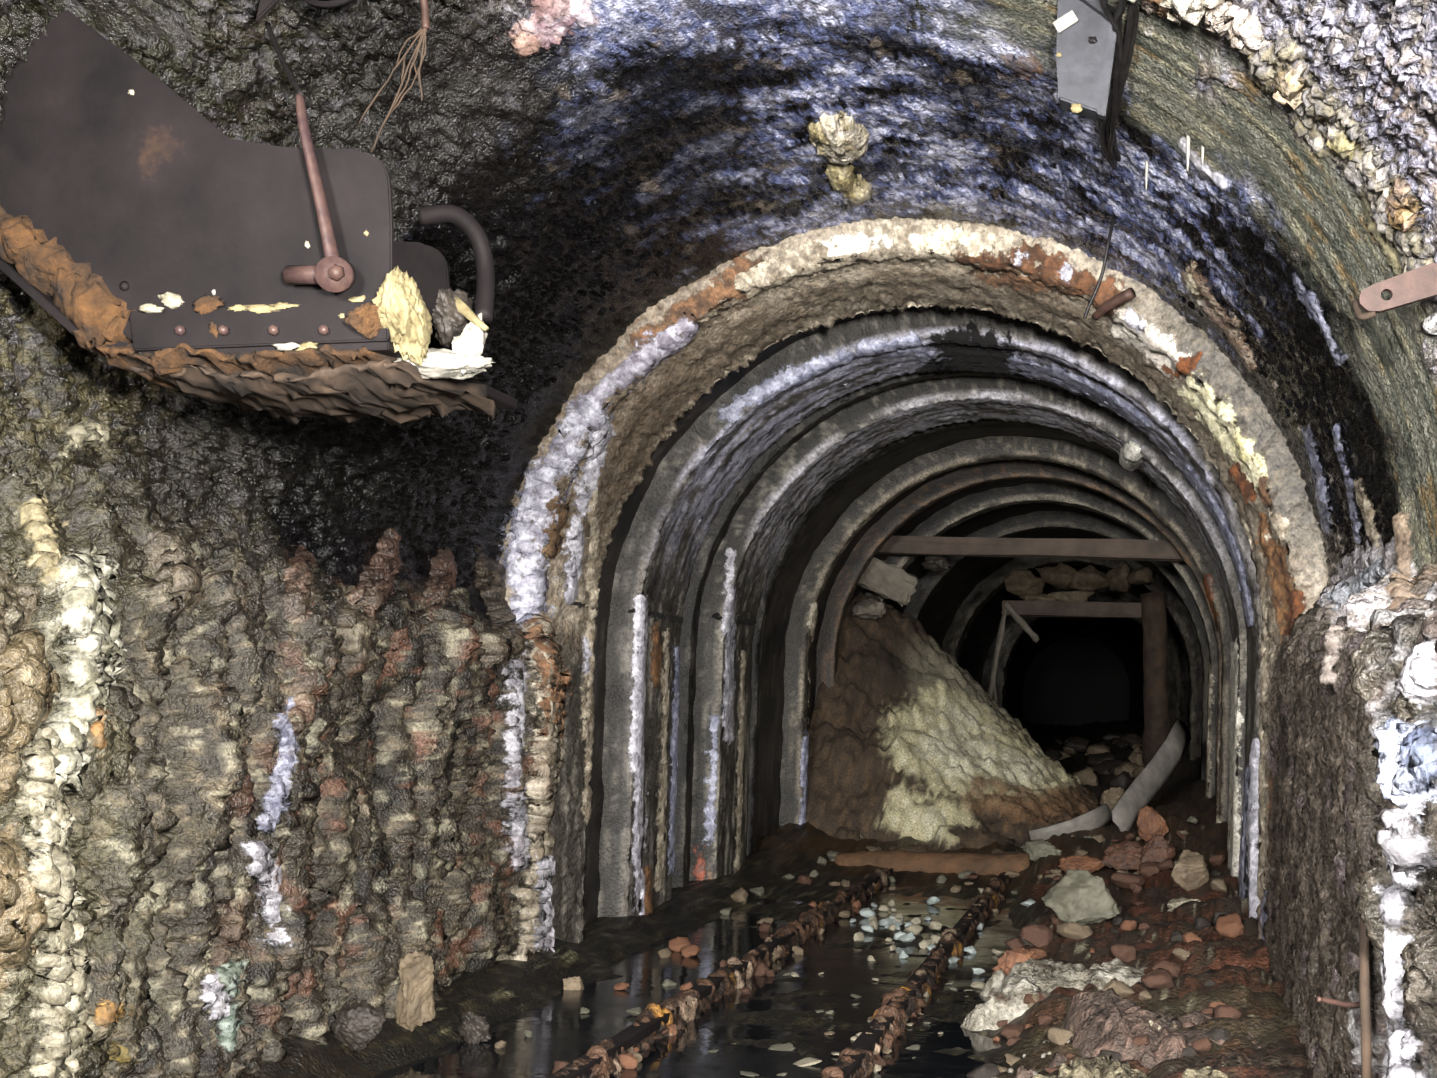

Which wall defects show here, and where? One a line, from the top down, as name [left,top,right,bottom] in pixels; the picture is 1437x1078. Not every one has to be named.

damp [1178,137,1229,190]
damp [1246,28,1436,276]
corrosion [953,239,1136,321]
damp [1049,363,1151,430]
corrosion [1161,351,1202,382]
damp [1179,258,1257,375]
damp [1292,272,1348,366]
corrosion [1227,462,1306,645]
damp [1301,422,1417,686]
damp [498,480,600,961]